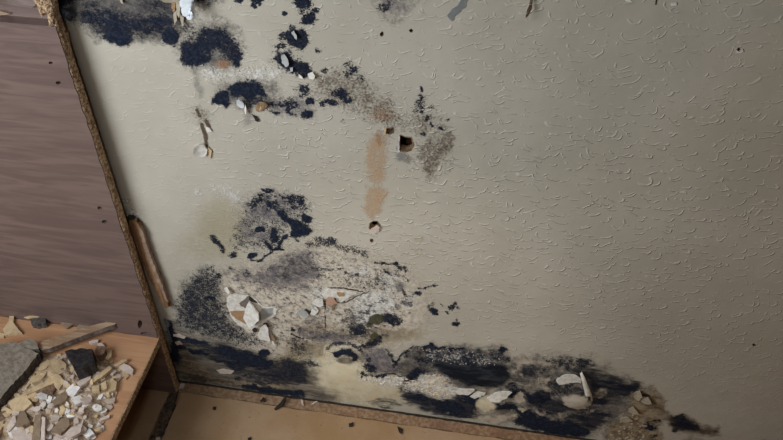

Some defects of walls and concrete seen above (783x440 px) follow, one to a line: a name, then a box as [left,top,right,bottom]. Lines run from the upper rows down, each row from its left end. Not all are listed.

leakage [58,0,243,70]
leakage [211,0,391,121]
spalling [383,128,414,153]
leakage [412,86,455,175]
flaking render [224,287,278,347]
flaking render [298,289,356,317]
leakage [167,188,645,438]
flaking render [361,374,512,413]
flaking render [556,371,593,402]
leakage [668,414,718,434]